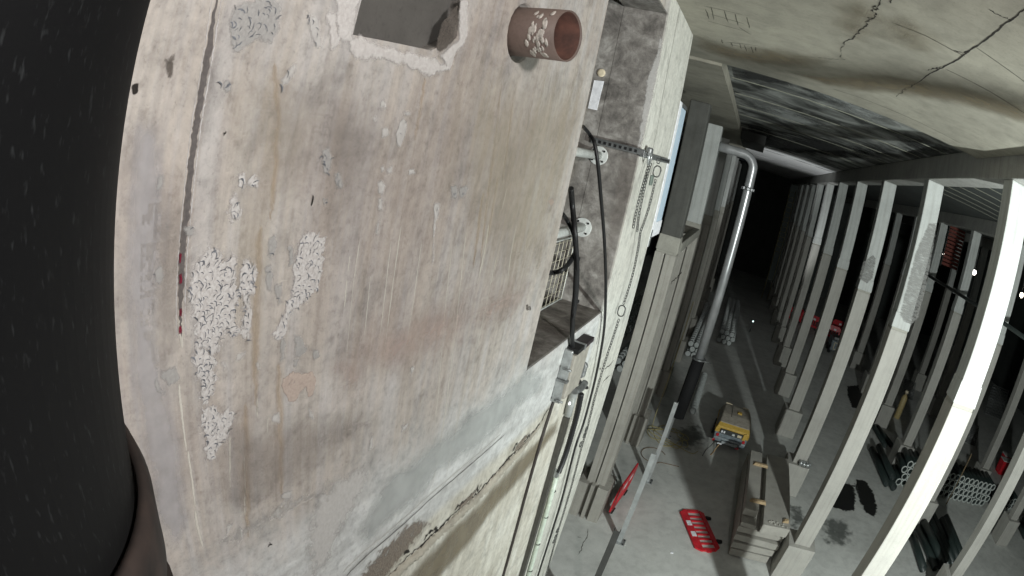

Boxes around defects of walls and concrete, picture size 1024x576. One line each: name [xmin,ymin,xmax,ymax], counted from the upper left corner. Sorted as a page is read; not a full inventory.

spalling [437,6,458,51]
crack [826,0,892,60]
damp [708,45,1024,118]
crack [896,9,1024,97]
damp [748,108,894,158]
damp [902,133,950,153]
peeling [901,224,936,324]
damp [826,479,877,544]